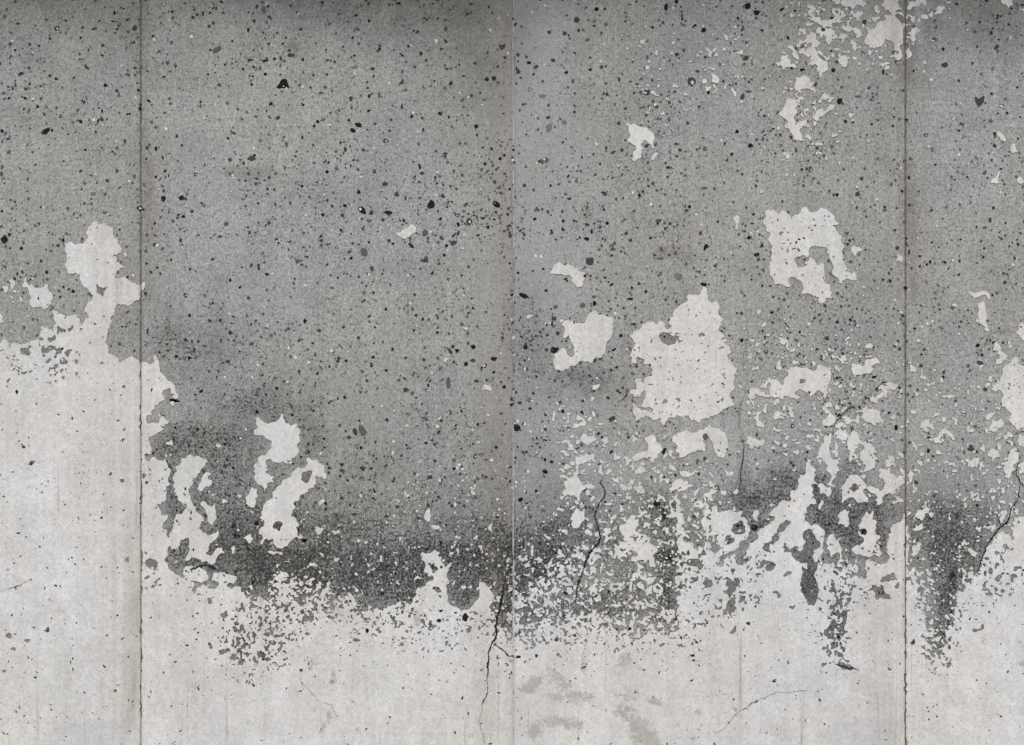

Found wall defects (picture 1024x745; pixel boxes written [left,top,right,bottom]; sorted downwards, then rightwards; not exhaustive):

peeling [626,0,951,177]
peeling [997,125,1020,160]
peeling [0,207,1024,745]
crack [564,388,629,617]
crack [977,430,1024,572]
crack [479,553,536,743]